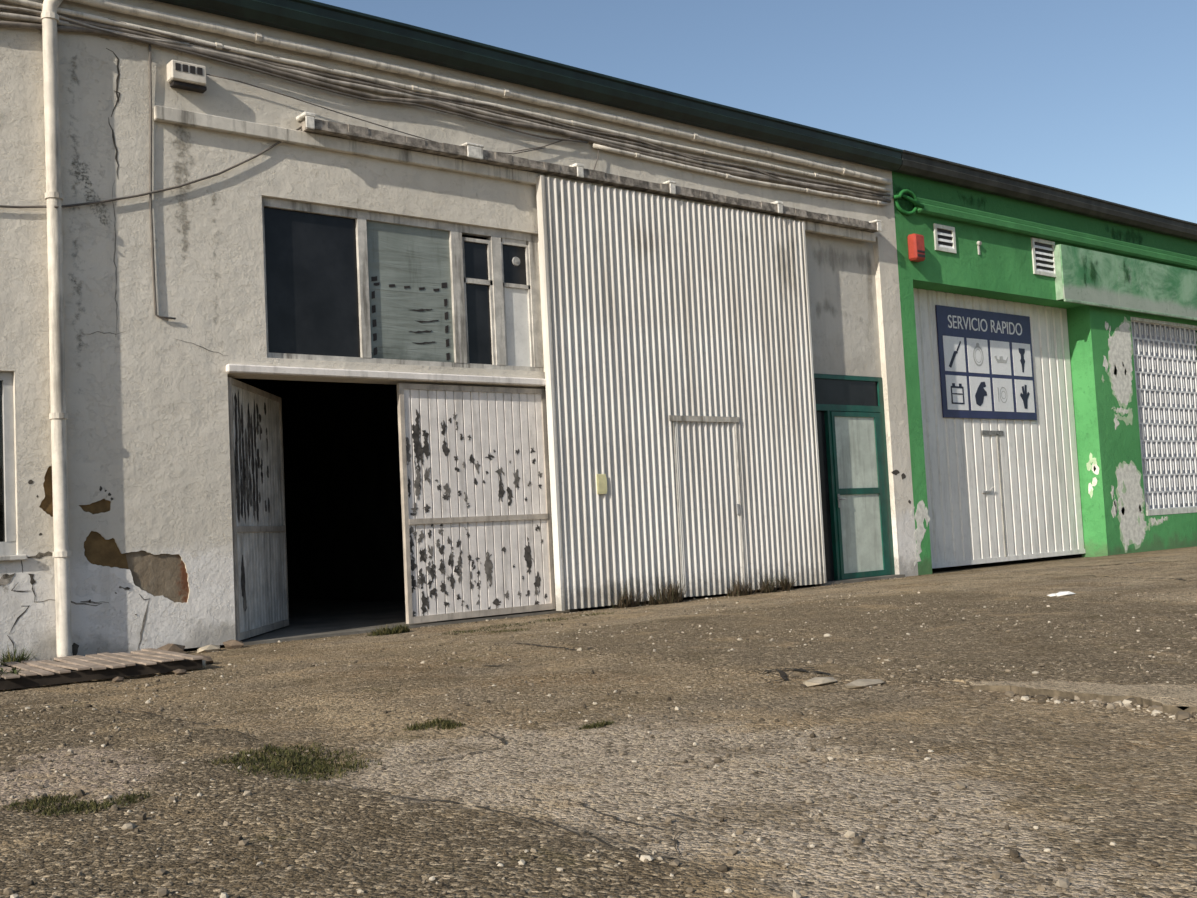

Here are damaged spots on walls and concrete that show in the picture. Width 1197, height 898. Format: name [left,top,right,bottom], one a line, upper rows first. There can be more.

crack [91,48,125,337]
peeling [1101,316,1133,430]
flaking render [28,466,53,517]
flaking render [79,486,113,514]
peeling [232,390,270,524]
peeling [406,410,547,617]
peeling [1086,453,1168,553]
flaking render [0,573,36,586]
flaking render [84,531,190,603]